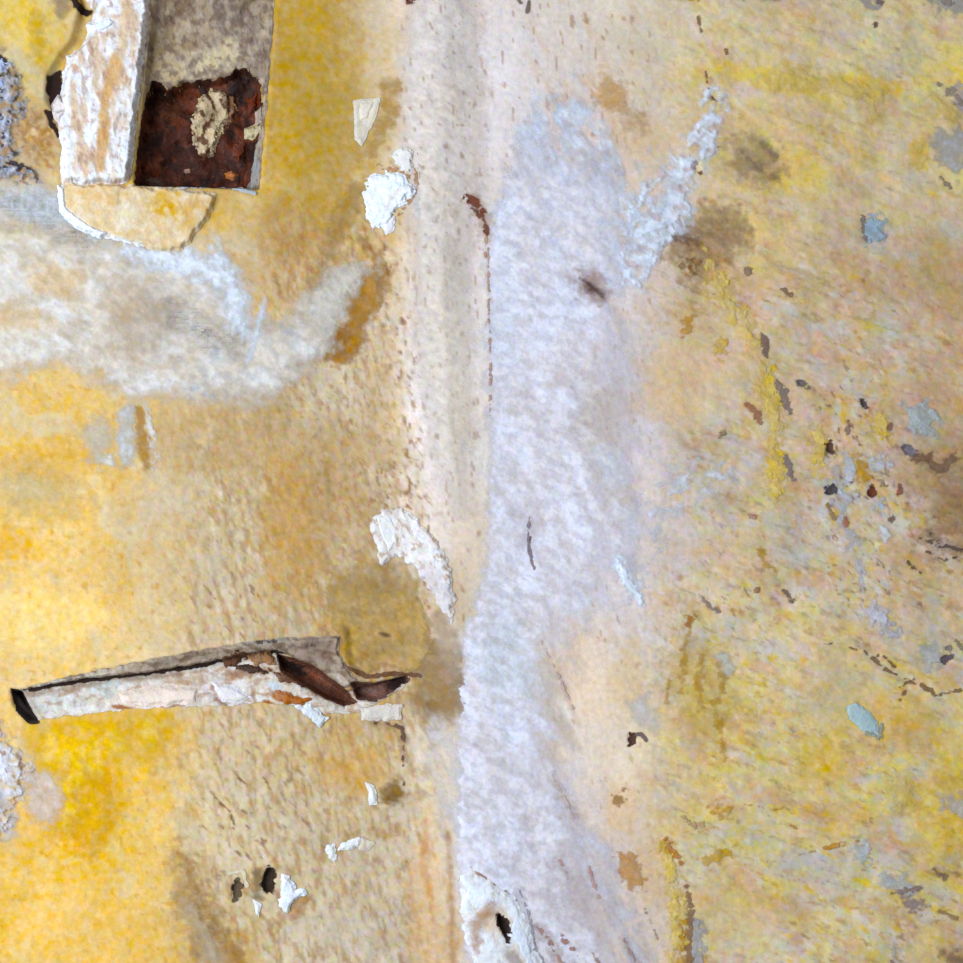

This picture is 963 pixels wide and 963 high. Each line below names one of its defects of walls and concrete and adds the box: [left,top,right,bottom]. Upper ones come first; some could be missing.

flaking render [0,55,39,183]
peeling [44,0,274,252]
water stain [0,183,365,405]
flaking render [362,148,422,235]
flaking render [10,508,457,728]
water stain [412,87,735,963]
hole [227,865,308,917]
peeling [459,870,544,963]